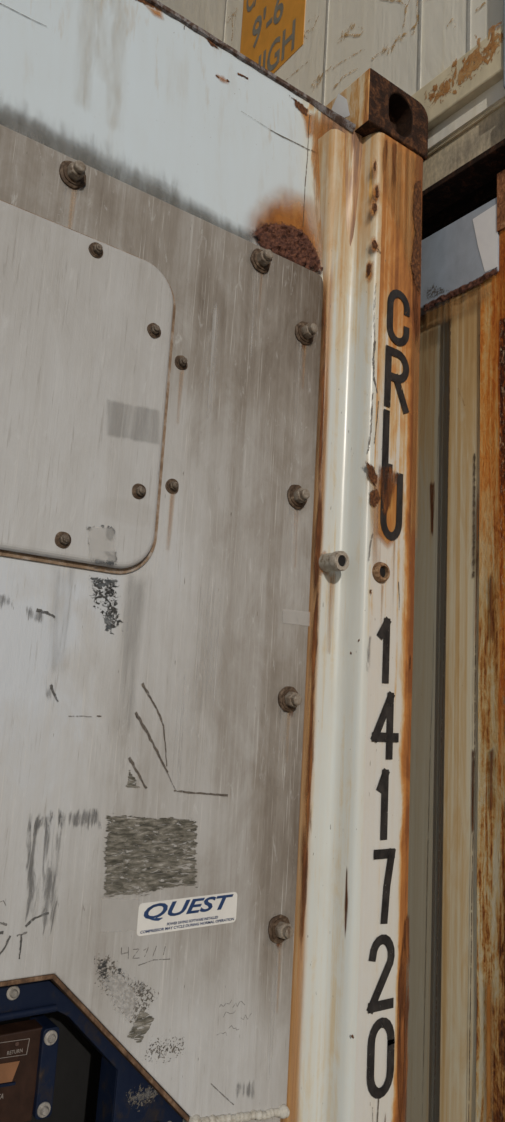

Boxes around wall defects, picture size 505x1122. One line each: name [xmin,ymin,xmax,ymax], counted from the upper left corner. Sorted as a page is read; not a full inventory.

rust [295,100,324,200]
rust [365,462,398,552]
rust [468,454,493,1122]